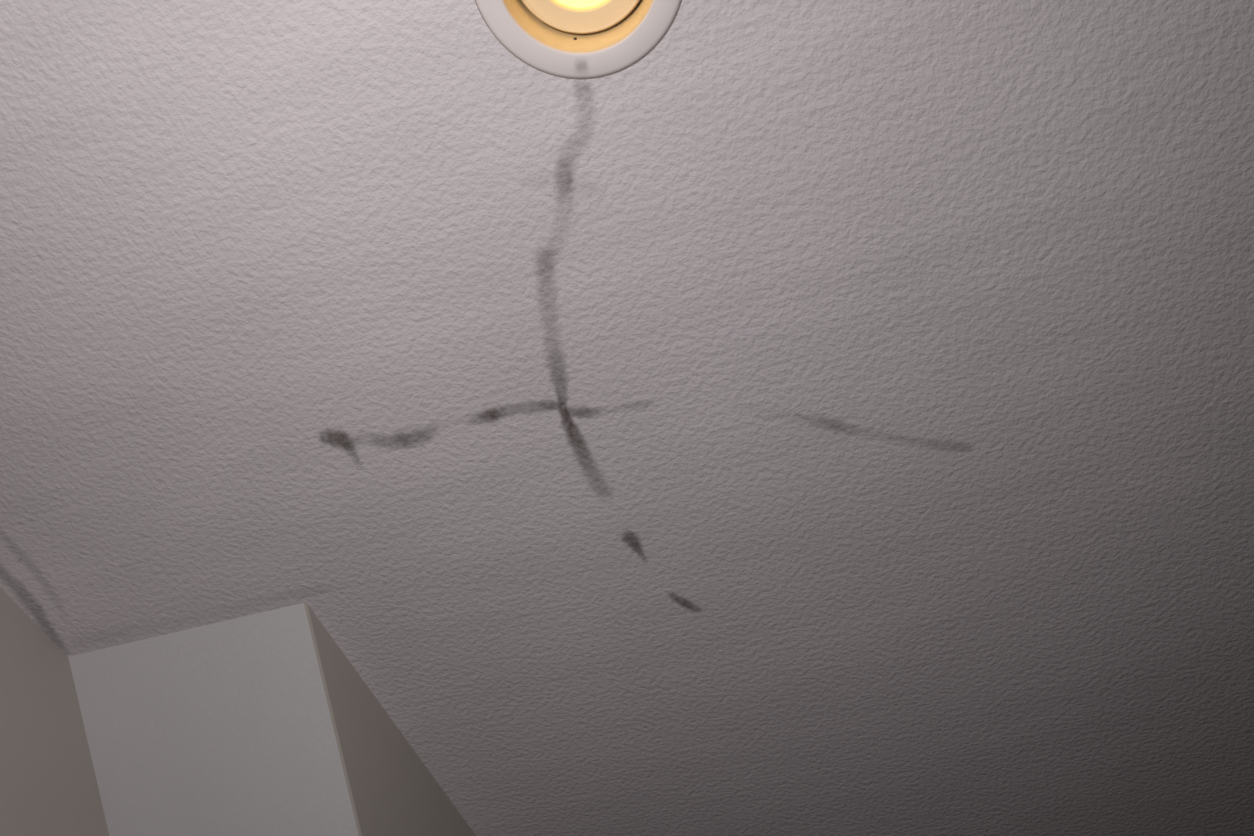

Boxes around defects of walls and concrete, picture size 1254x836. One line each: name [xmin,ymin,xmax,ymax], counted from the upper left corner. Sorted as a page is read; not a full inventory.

crack [486,410,498,419]
crack [549,404,581,447]
crack [328,434,347,445]